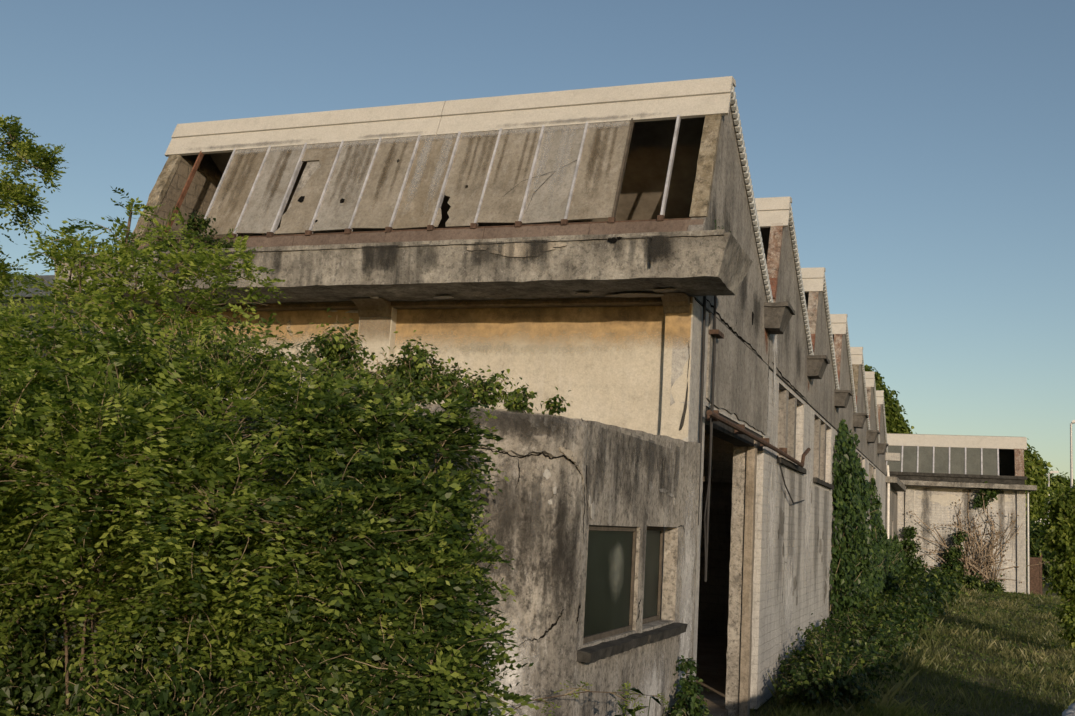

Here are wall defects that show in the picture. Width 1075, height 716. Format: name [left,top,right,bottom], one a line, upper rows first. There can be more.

water stain [236,121,629,185]
crack [470,446,588,524]
water stain [555,507,579,574]
water stain [480,633,525,716]
crack [517,605,581,646]
water stain [679,590,691,687]